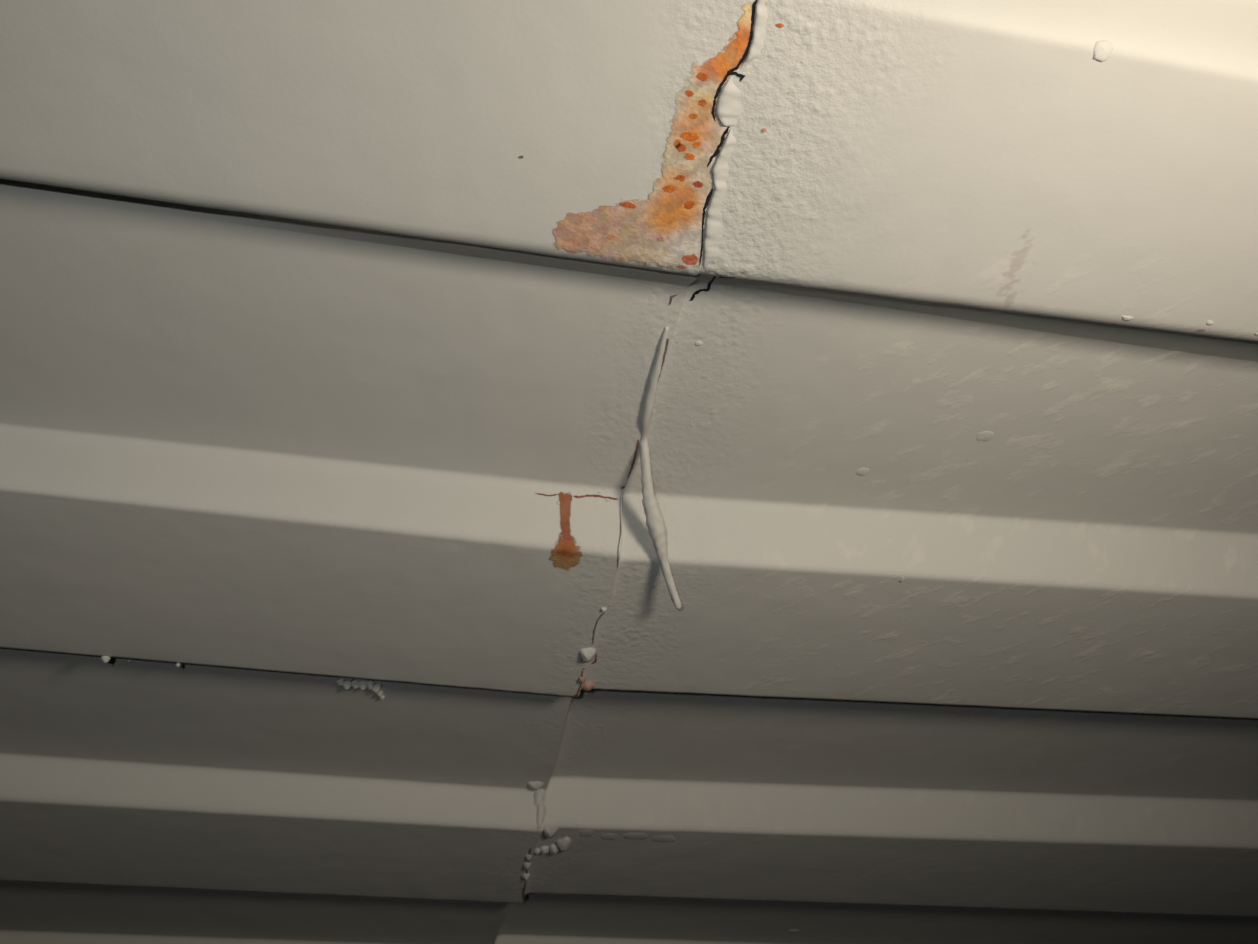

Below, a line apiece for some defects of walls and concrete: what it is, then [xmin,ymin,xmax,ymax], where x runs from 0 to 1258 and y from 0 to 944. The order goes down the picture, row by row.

rust [553,2,767,269]
crack [670,0,768,305]
crack [659,338,669,377]
rust [537,492,618,570]
crack [617,439,639,564]
crack [570,613,604,697]
crack [523,848,531,900]